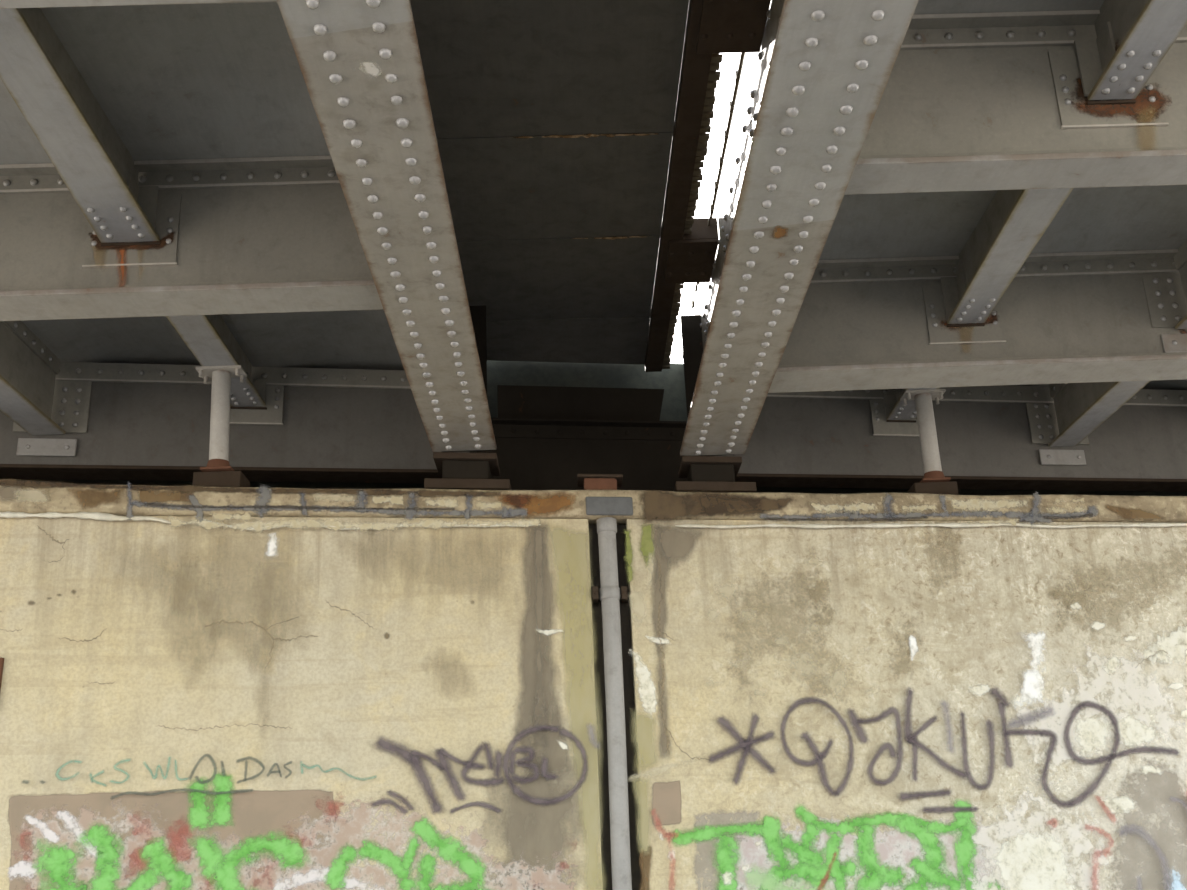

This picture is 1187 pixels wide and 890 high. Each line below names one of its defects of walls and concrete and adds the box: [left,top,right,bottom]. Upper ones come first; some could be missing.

corrosion [1072,78,1172,123]
corrosion [89,232,175,287]
corrosion [501,493,575,516]
water stain [268,535,277,556]
crack [205,617,317,666]
water stain [625,490,792,767]
water stain [498,526,603,890]
peeling [970,685,991,696]
peeling [1011,626,1187,772]
peeling [1142,766,1161,774]
water stain [636,781,652,890]
peeling [971,791,1134,890]